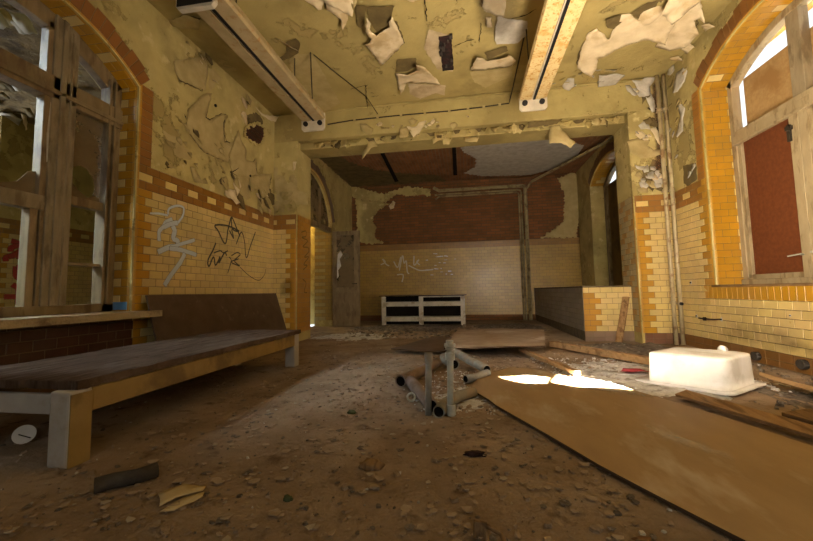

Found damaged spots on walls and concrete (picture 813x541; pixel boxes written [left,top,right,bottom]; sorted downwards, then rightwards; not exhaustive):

peeling [0,107,35,131]
peeling [0,8,38,35]
peeling [276,38,340,112]
peeling [305,0,453,99]
peeling [470,0,528,88]
peeling [553,0,715,193]
flaking render [314,116,615,245]